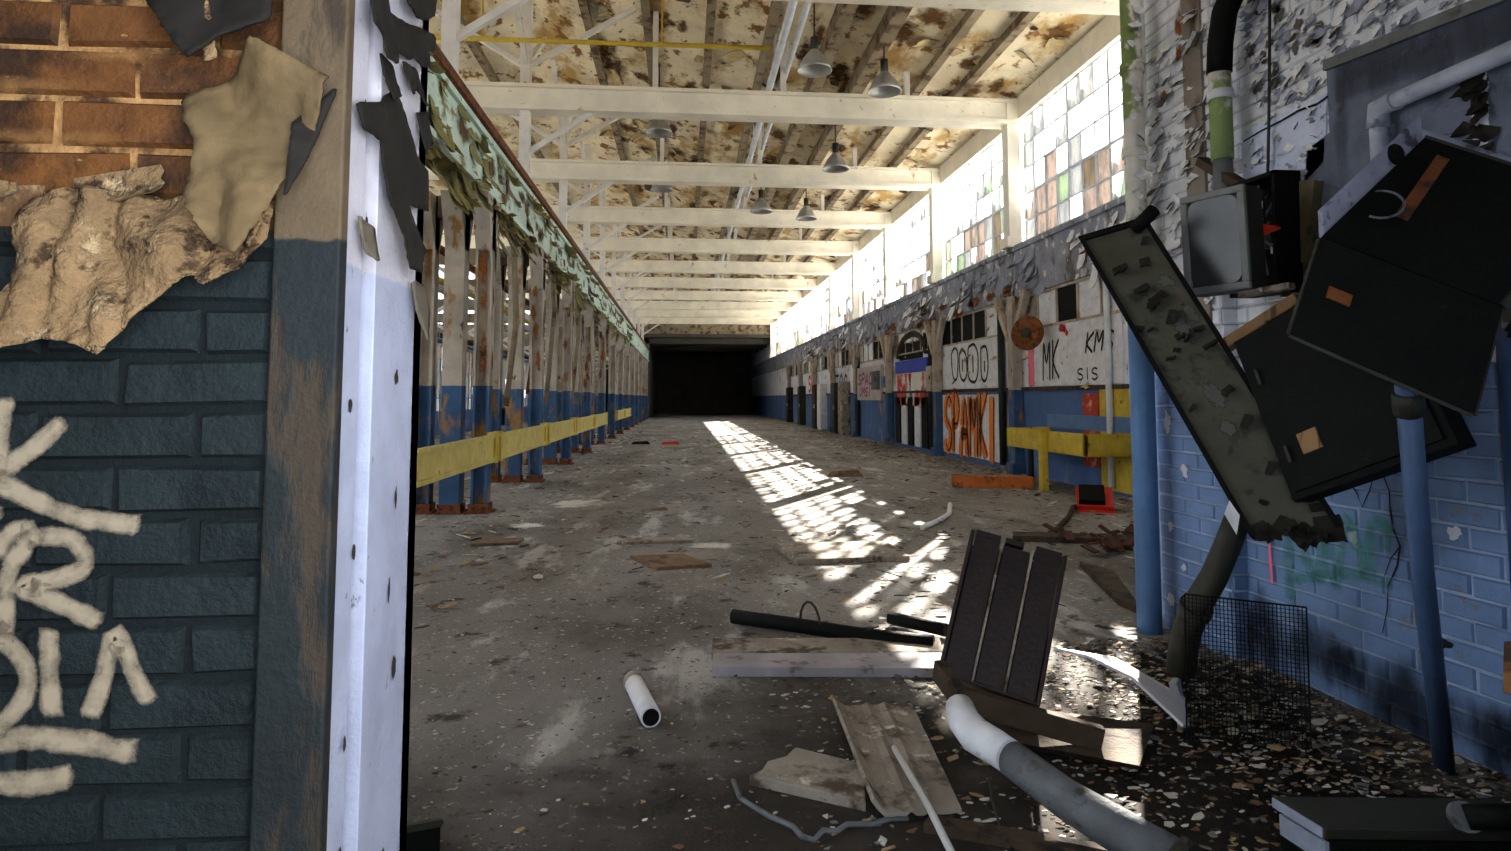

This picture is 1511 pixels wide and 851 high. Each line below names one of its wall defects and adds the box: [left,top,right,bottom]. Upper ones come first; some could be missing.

peeling [1014,28,1068,63]
peeling [694,50,794,92]
peeling [1236,0,1470,176]
peeling [1442,71,1500,150]
peeling [599,119,698,163]
peeling [707,125,778,164]
peeling [0,0,337,355]
peeling [356,0,634,353]
peeling [620,185,756,208]
corrosion [459,121,631,388]
peeling [756,228,837,258]